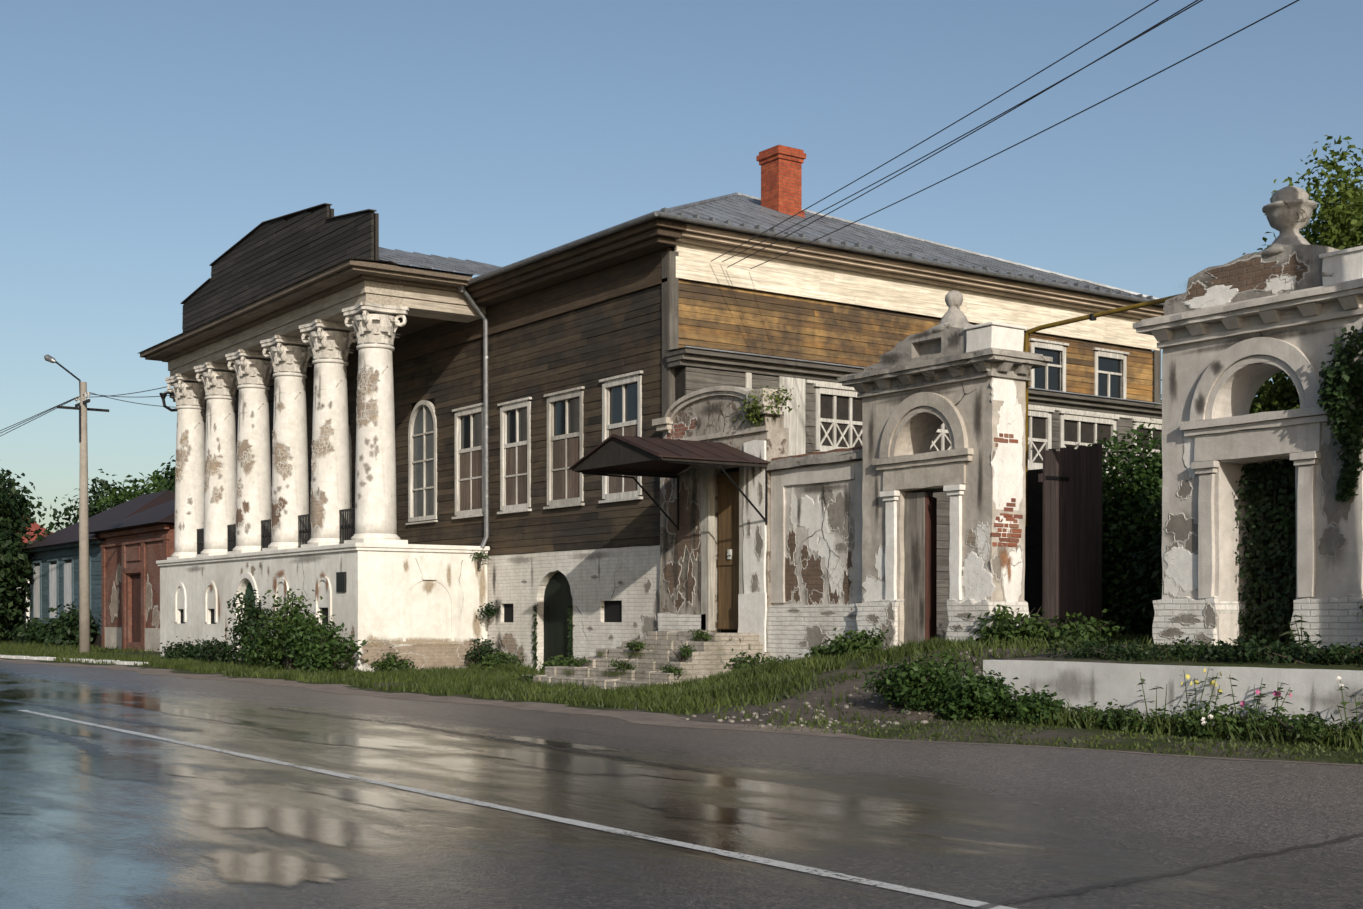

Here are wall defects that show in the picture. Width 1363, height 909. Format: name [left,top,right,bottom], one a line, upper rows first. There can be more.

spalling [1183,250,1311,310]
peeling [174,402,256,544]
peeling [271,382,294,536]
spalling [310,384,335,531]
peeling [355,366,380,510]
peeling [785,486,896,651]
peeling [950,377,1024,635]
peeling [1159,430,1217,645]
peeling [1316,430,1361,559]